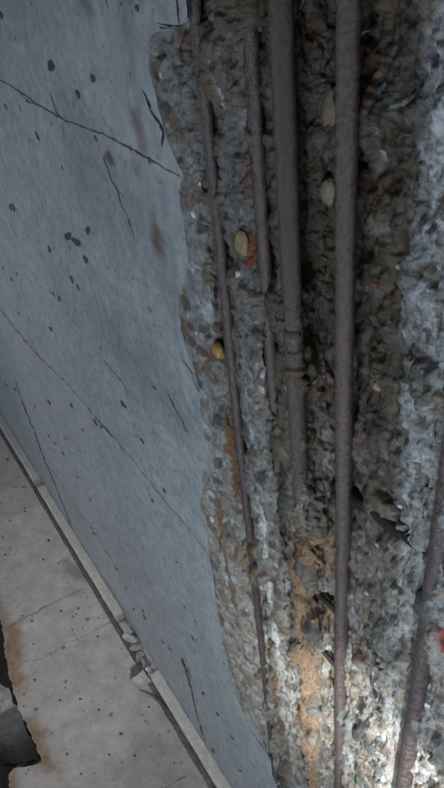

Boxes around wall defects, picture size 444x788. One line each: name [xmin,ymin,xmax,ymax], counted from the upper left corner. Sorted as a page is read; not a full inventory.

crack [0,80,180,177]
spalling [148,0,444,788]
crack [14,378,71,524]
rust [225,411,250,503]
rust [224,554,237,608]
spalling [117,656,152,686]
crack [182,659,205,739]
rust [271,675,281,712]
rust [288,526,334,788]